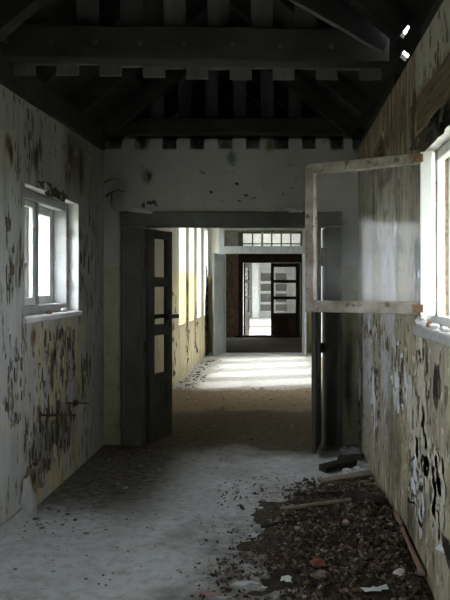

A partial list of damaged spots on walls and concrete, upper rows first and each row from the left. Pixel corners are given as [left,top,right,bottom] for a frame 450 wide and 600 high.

spalling [15,137,71,202]
peeling [5,205,28,305]
peeling [79,205,97,310]
peeling [4,334,34,427]
peeling [19,325,91,519]
peeling [357,314,450,570]